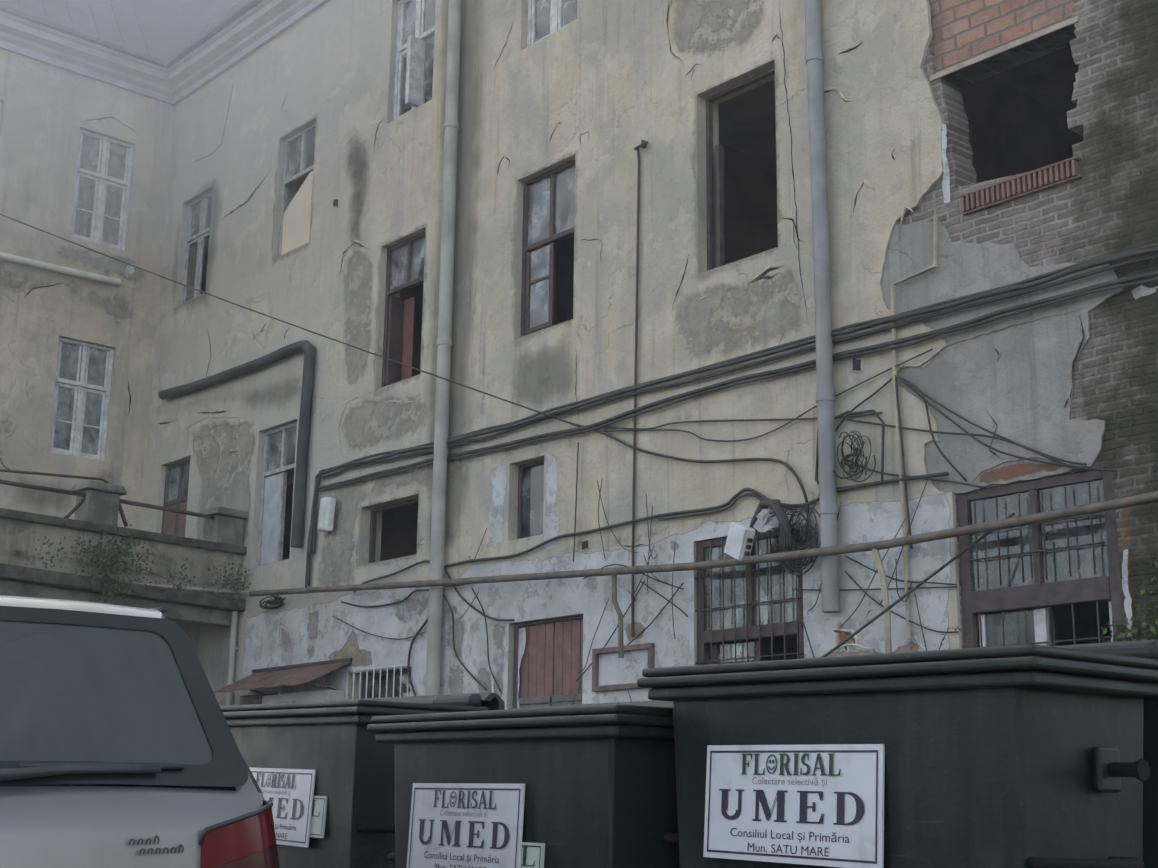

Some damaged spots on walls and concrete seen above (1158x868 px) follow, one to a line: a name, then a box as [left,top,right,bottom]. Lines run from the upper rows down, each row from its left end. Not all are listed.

flaking render [664,0,762,64]
crack [220,166,273,221]
leakage [348,143,366,231]
crack [748,3,810,343]
flaking render [967,454,1080,488]
flaking render [308,611,318,657]
flaking render [329,631,372,667]
flaking render [448,605,470,694]
flaking render [491,625,504,697]
peeling [517,628,526,708]